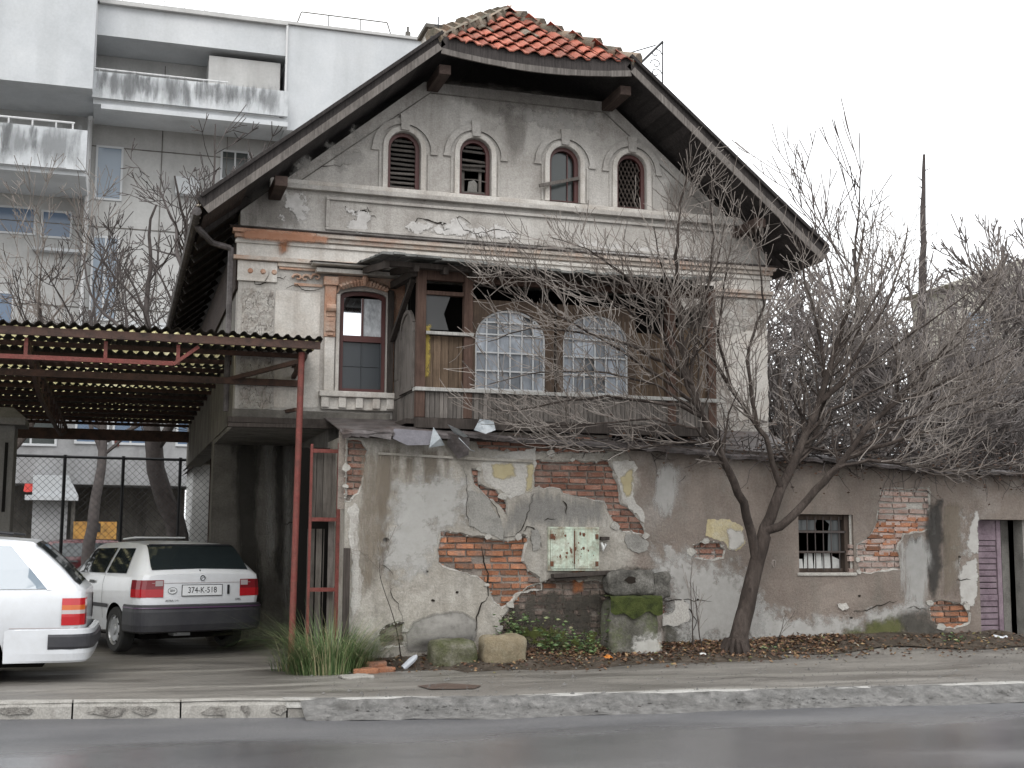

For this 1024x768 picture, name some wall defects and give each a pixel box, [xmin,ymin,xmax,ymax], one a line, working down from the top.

water stain [3,127,66,156]
peeling [346,208,371,234]
peeling [399,218,522,242]
flaking render [337,430,369,617]
crack [463,467,567,630]
flaking render [436,530,610,649]
flaking render [471,431,650,553]
water stain [632,554,744,654]
peeling [664,519,745,561]
water stain [749,499,960,640]
flaking render [846,486,931,574]
flaking render [926,511,979,630]